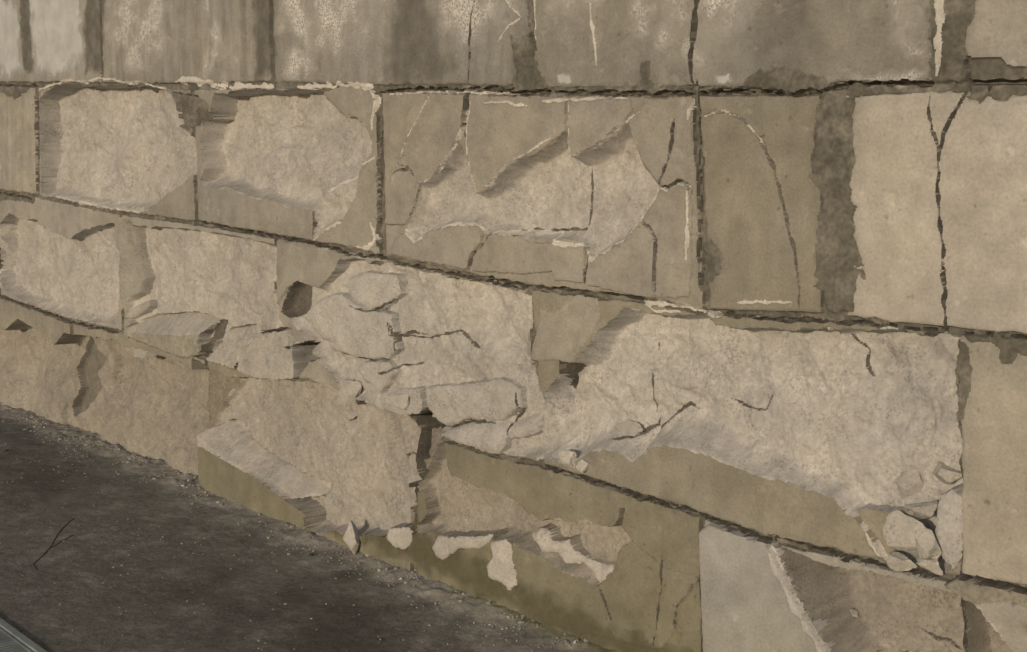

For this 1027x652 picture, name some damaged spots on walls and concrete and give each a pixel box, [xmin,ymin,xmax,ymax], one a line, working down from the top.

crack [461,0,475,138]
spalling [39,83,692,299]
crack [375,125,420,247]
crack [467,232,493,269]
crack [521,169,594,232]
crack [643,222,658,292]
crack [658,0,801,309]
crack [926,56,976,329]
spalling [0,214,1027,652]